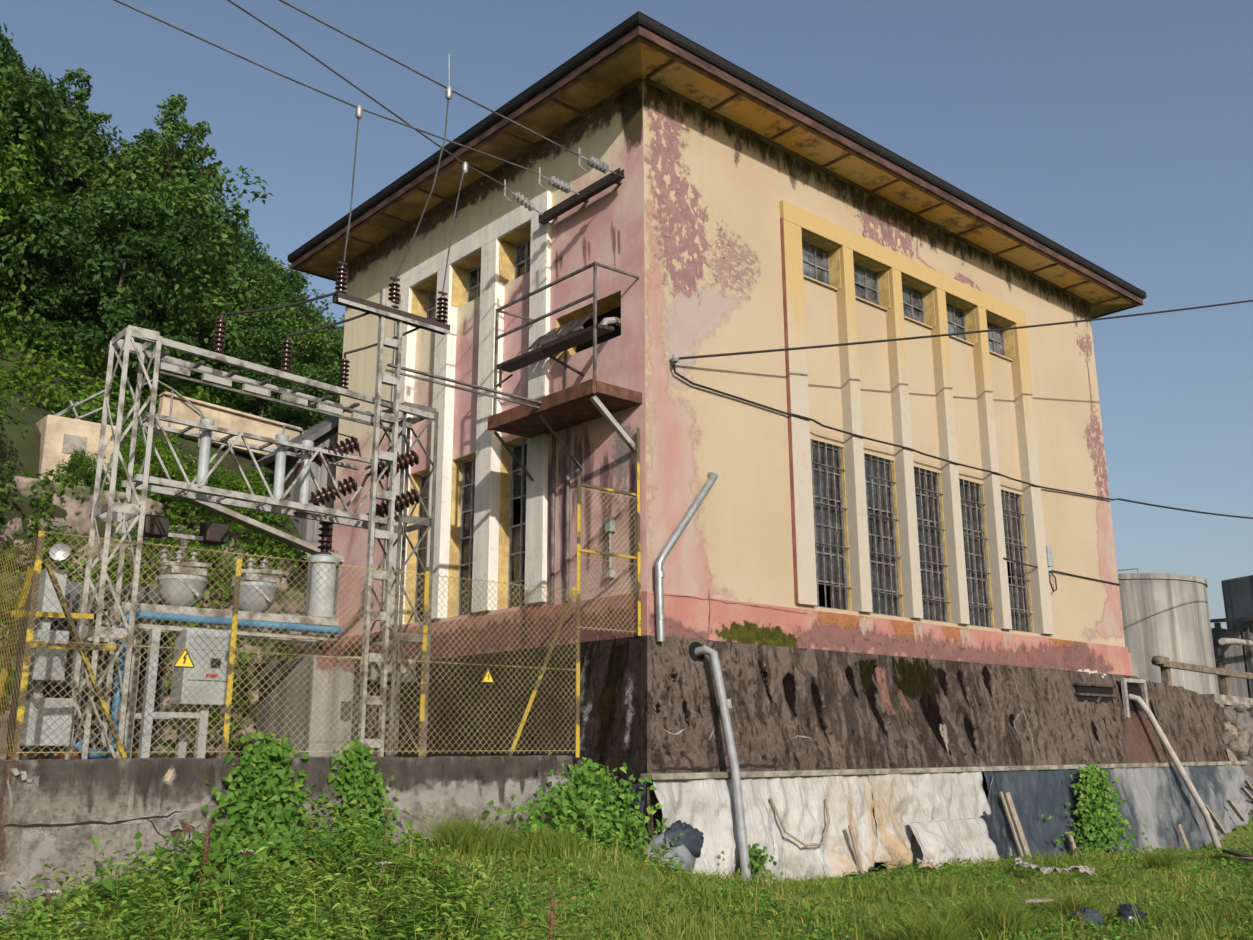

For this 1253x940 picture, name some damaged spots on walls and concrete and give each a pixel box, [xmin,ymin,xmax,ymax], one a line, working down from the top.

peeling [644,100,761,298]
leakage [347,83,1090,326]
spalling [857,204,914,258]
peeling [954,273,982,292]
peeling [1077,334,1092,357]
peeling [1086,405,1110,499]
crack [3,776,182,836]